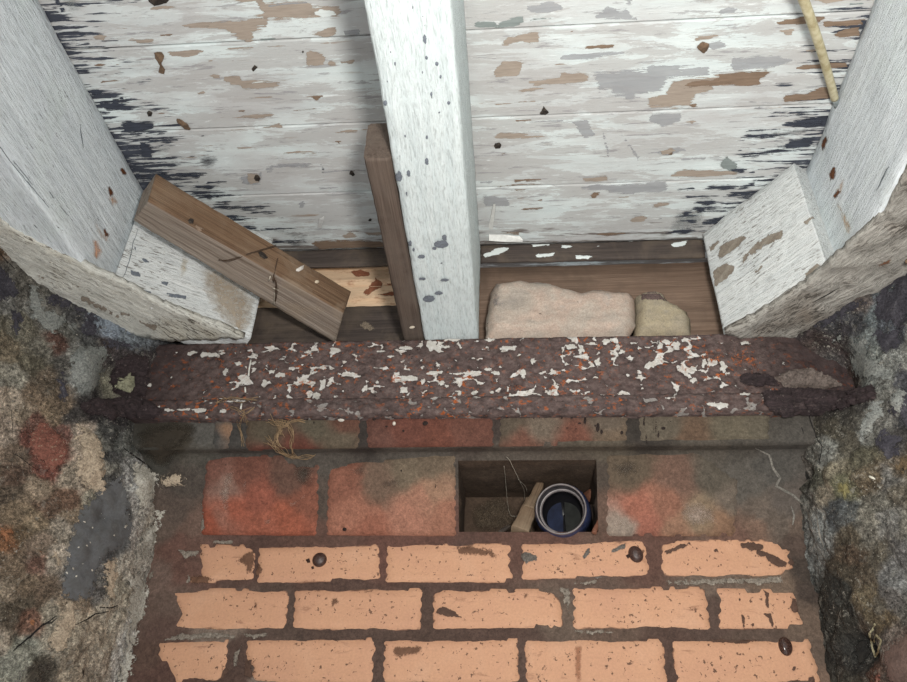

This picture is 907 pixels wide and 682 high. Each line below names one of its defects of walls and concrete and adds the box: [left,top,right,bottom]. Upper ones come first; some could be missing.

peeling [182,0,360,66]
peeling [474,1,563,46]
peeling [777,16,867,37]
peeling [494,55,848,127]
peeling [581,135,738,199]
peeling [483,247,509,258]
peeling [533,244,592,259]
peeling [710,230,783,286]
peeling [0,266,157,339]
peeling [176,350,256,376]
peeling [400,367,500,393]
peeling [657,339,707,383]